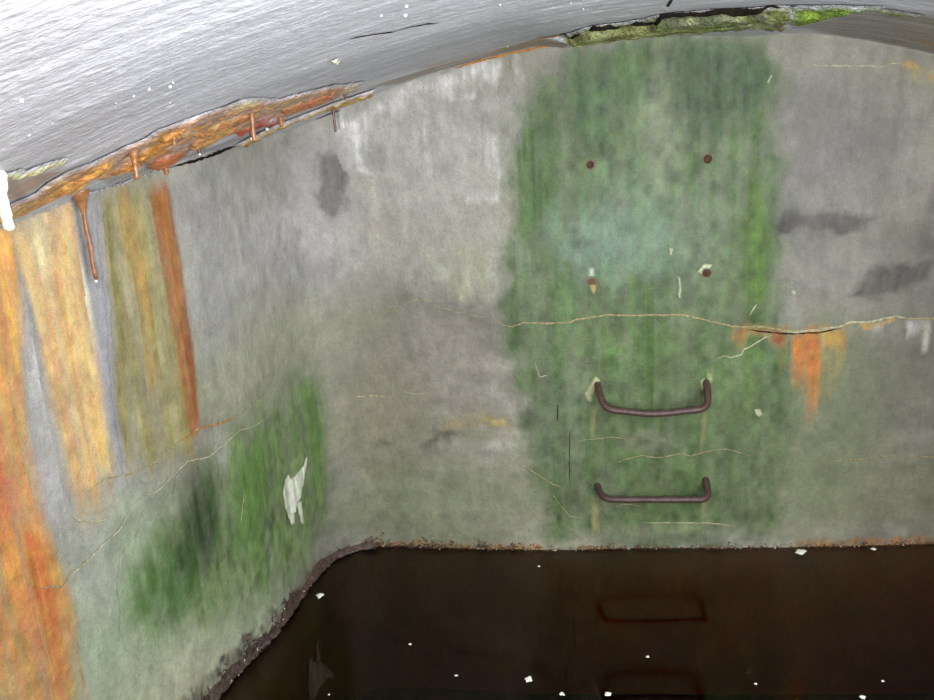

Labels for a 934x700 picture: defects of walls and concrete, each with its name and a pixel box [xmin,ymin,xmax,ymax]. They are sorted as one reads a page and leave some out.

crack [352,23,437,39]
crack [456,0,816,68]
leakage [7,53,527,275]
crack [373,299,934,358]
rust [730,315,898,432]
leakage [770,202,881,241]
leakage [842,253,934,306]
rust [0,170,202,700]
crack [41,393,270,589]
leakage [121,412,273,652]
leakage [298,358,332,522]
leakage [793,531,934,552]